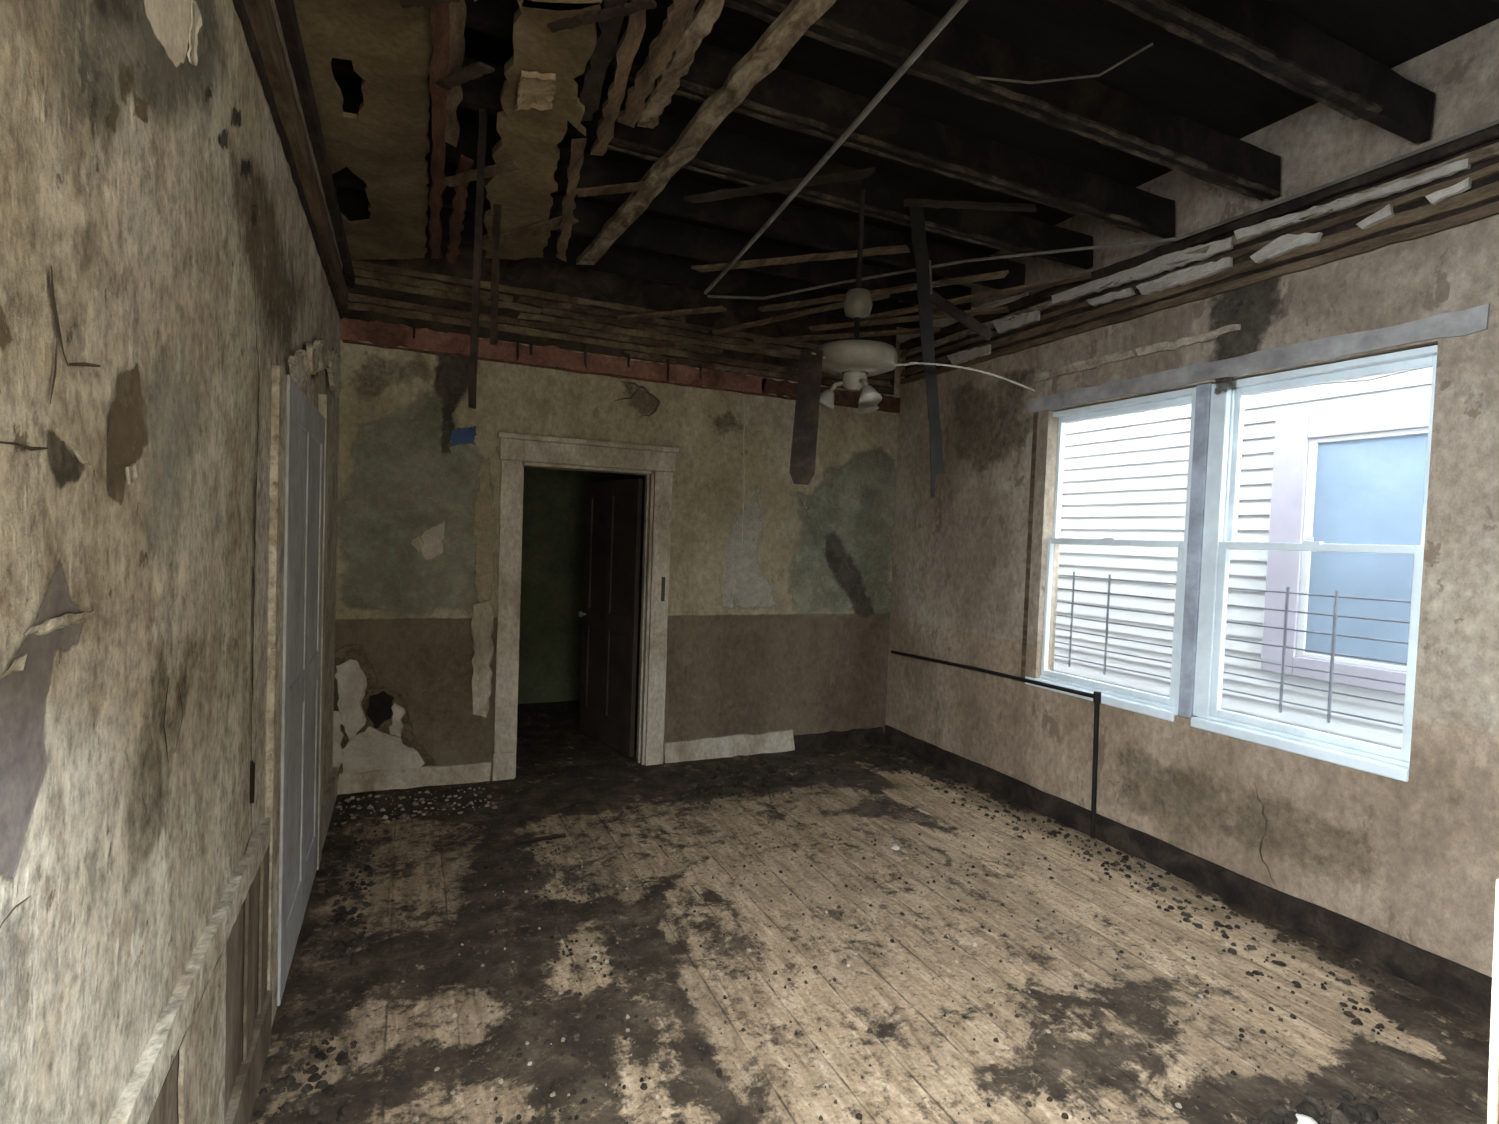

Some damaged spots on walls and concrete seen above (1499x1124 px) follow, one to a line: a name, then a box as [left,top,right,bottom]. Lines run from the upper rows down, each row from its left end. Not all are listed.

flaking render [144,0,202,67]
flaking render [343,124,1499,395]
crack [50,266,101,404]
crack [0,441,48,451]
flaking render [48,364,148,505]
peeling [449,426,476,447]
spalling [411,521,445,560]
peeling [471,459,494,718]
flaking render [0,559,94,880]
spalling [332,644,436,780]